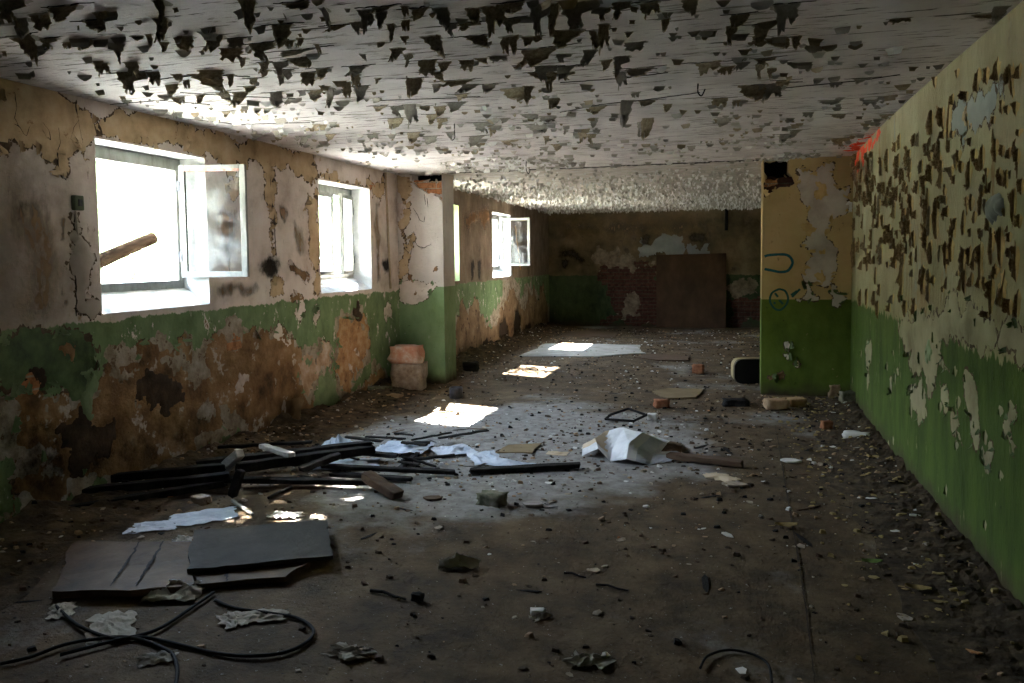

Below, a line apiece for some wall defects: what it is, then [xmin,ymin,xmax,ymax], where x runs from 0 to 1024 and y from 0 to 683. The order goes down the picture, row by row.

crack [71,275,79,316]
flaking render [0,0,1024,522]